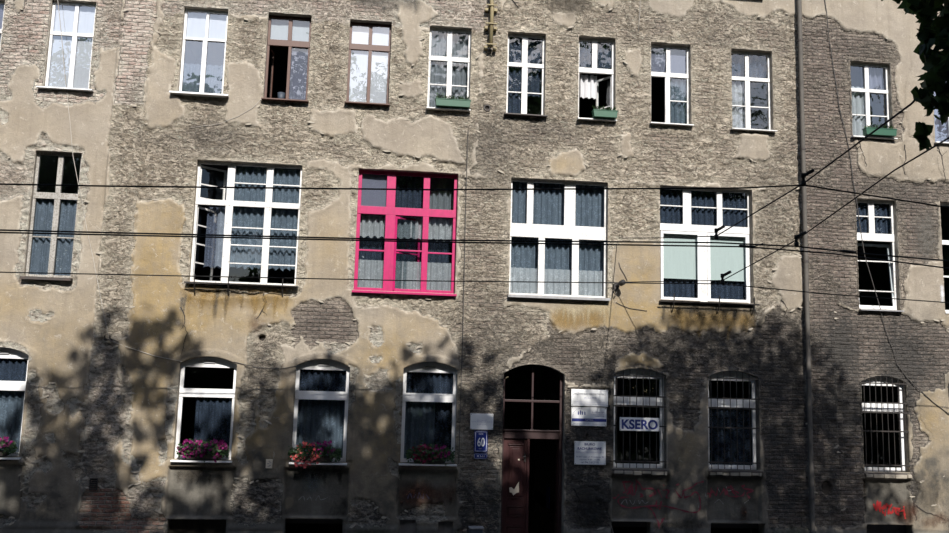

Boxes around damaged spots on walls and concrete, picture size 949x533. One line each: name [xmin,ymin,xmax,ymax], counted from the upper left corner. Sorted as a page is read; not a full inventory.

spalling [0,0,490,533]
spalling [355,0,810,533]
spalling [802,13,949,529]